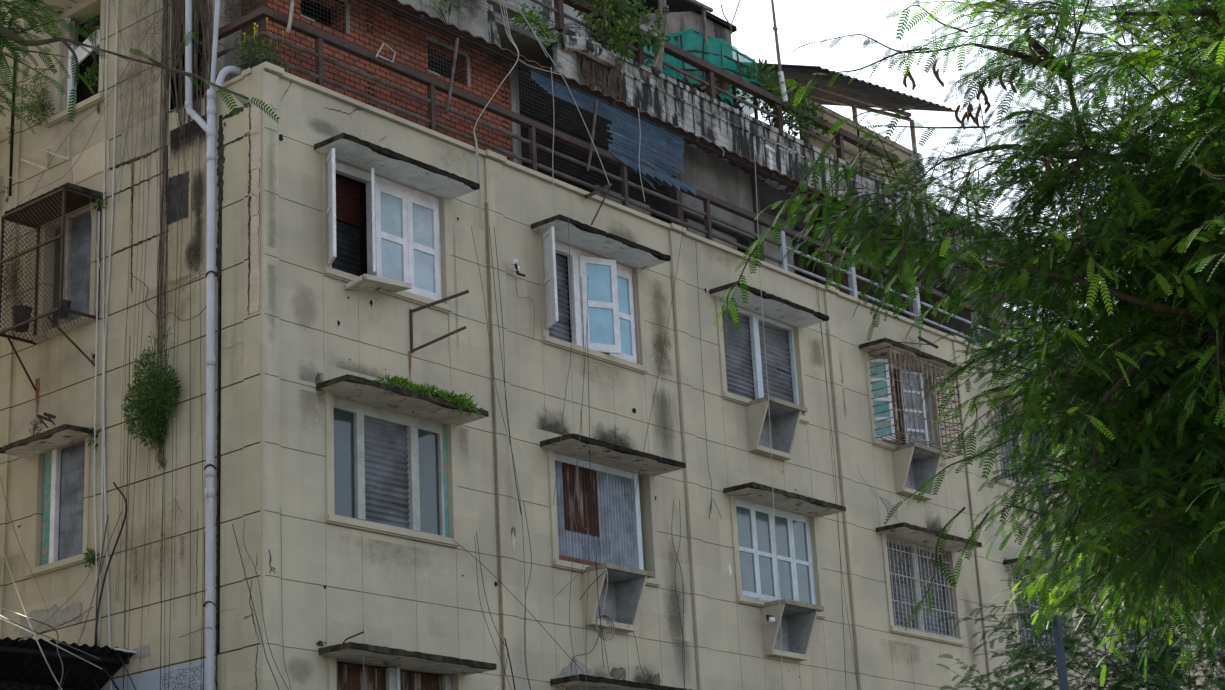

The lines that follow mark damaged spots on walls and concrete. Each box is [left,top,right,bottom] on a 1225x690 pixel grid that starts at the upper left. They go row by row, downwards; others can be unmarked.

water stain [108,103,249,690]
water stain [539,417,569,435]
water stain [595,430,630,448]